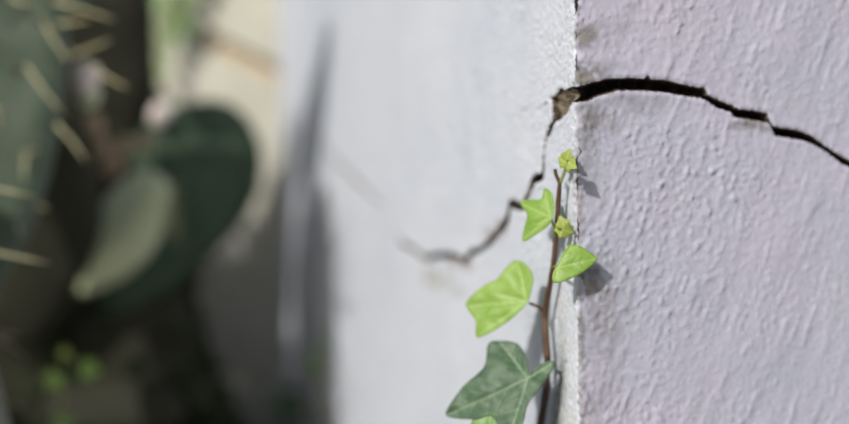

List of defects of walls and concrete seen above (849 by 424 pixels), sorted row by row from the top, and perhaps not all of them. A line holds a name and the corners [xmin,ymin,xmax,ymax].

crack [387,0,849,267]